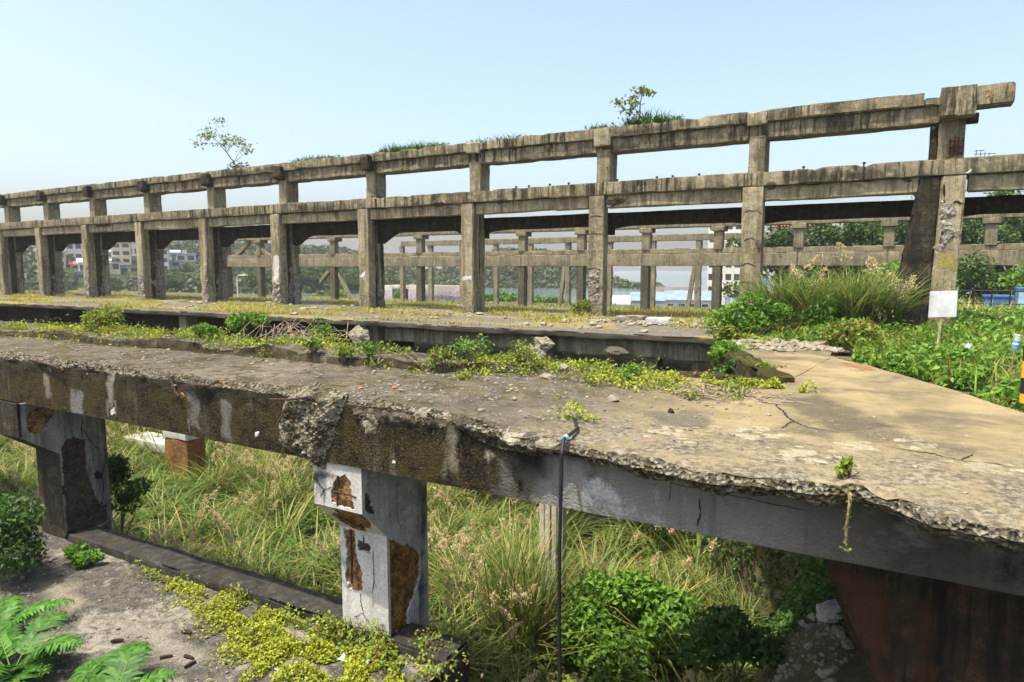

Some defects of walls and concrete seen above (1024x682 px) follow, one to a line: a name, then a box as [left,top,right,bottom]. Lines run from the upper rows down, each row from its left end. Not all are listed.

spalling [933,201,961,252]
crack [776,404,831,431]
spalling [61,436,108,535]
crack [630,472,701,525]
peeling [944,456,1024,486]